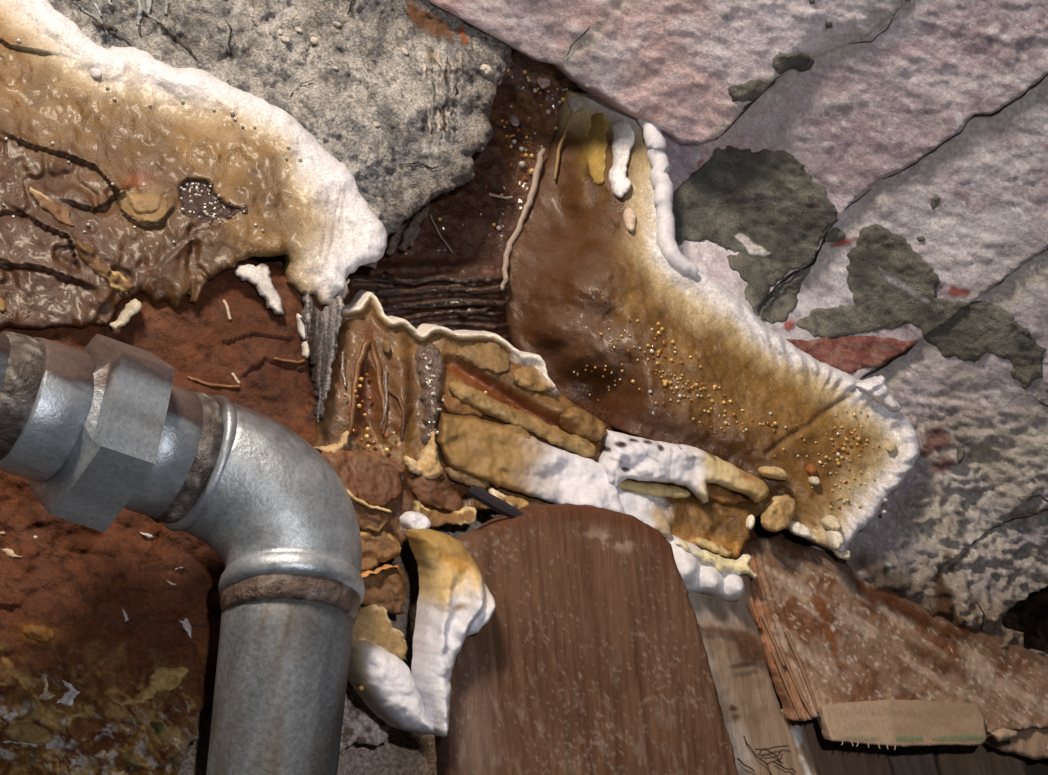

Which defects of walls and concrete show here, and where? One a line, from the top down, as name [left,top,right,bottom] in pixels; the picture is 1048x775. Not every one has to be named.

crack [850,0,911,44]
crack [716,74,784,139]
water stain [177,180,248,223]
peeling [49,0,591,346]
crack [756,74,1048,310]
peeling [948,286,968,296]
spalling [785,320,917,374]
water stain [379,369,388,430]
water stain [414,342,445,445]
water stain [698,625,765,667]
spalling [1002,586,1048,654]